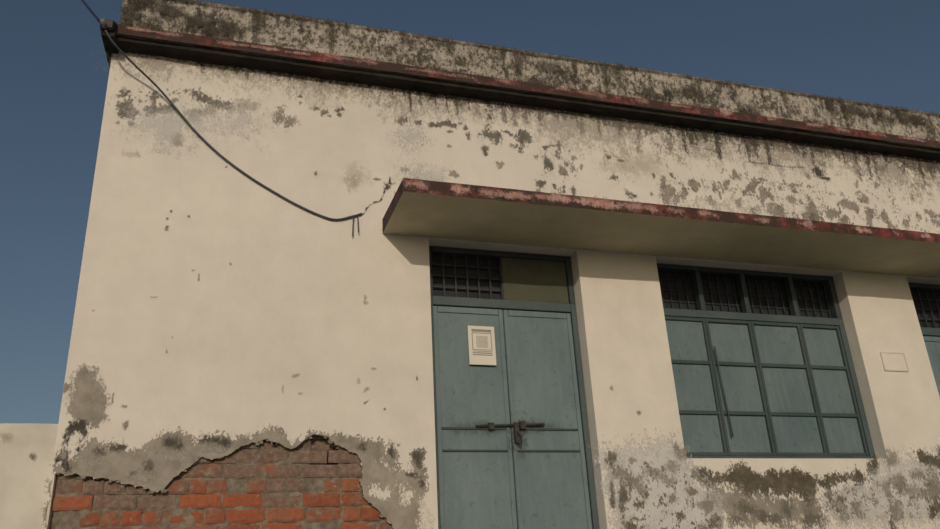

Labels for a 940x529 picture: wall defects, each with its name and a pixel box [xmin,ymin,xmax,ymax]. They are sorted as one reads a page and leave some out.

damp [119,0,940,132]
crack [363,177,392,214]
peeling [397,117,533,169]
damp [178,59,940,183]
peeling [449,141,940,238]
flaking render [41,363,435,529]
peeling [595,429,733,529]
peeling [819,446,940,529]